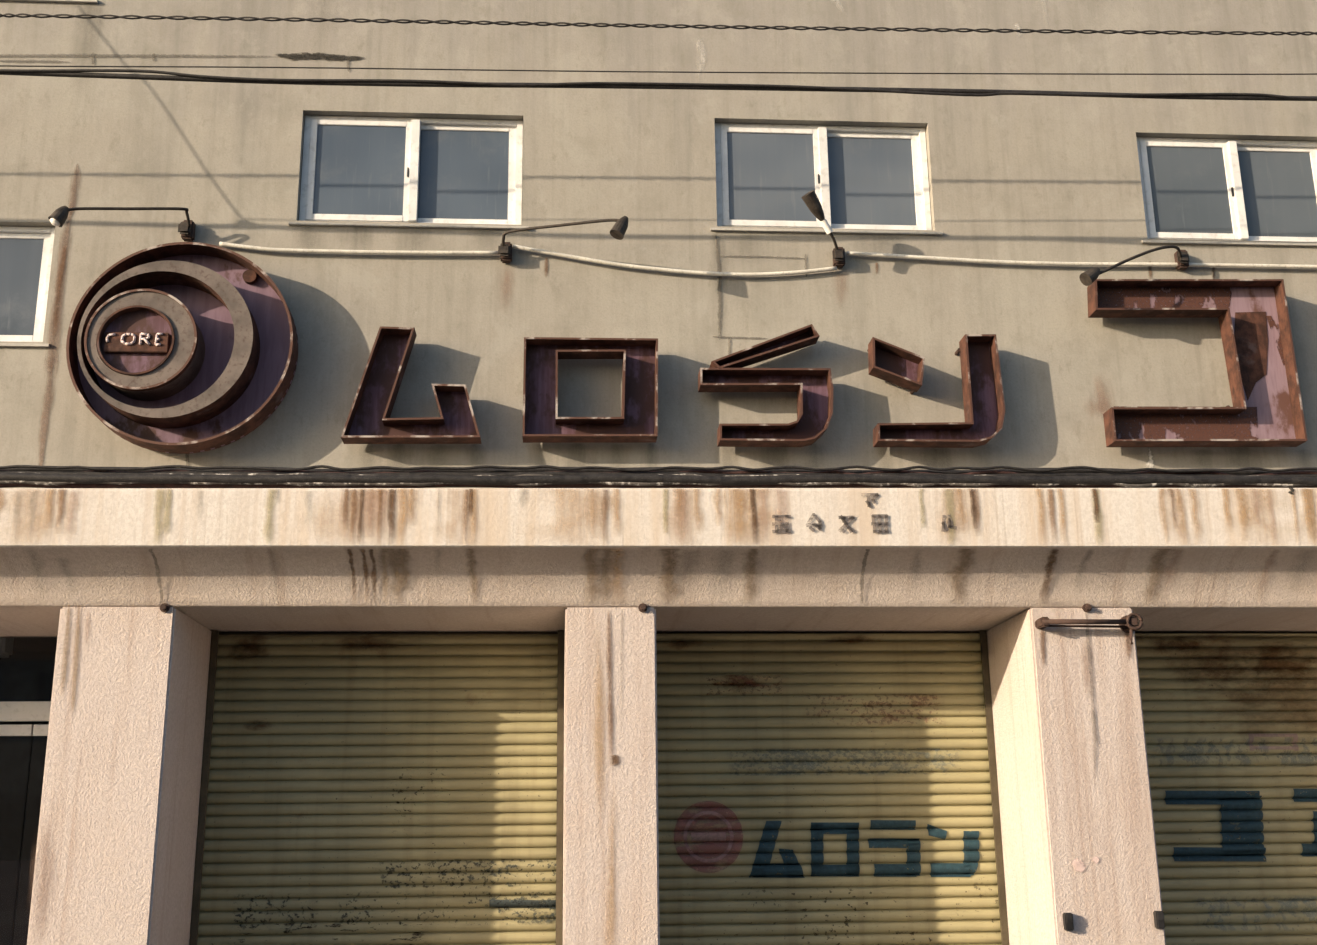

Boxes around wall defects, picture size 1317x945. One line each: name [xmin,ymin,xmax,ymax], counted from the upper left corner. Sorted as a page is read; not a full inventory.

corrosion [39,166,79,466]
corrosion [464,489,475,525]
corrosion [947,489,979,534]
corrosion [1037,489,1065,525]
corrosion [1223,489,1246,522]
corrosion [1288,488,1314,526]
corrosion [344,489,413,592]
corrosion [716,489,757,591]
corrosion [1043,549,1058,593]
corrosion [62,605,79,704]
corrosion [597,614,619,765]